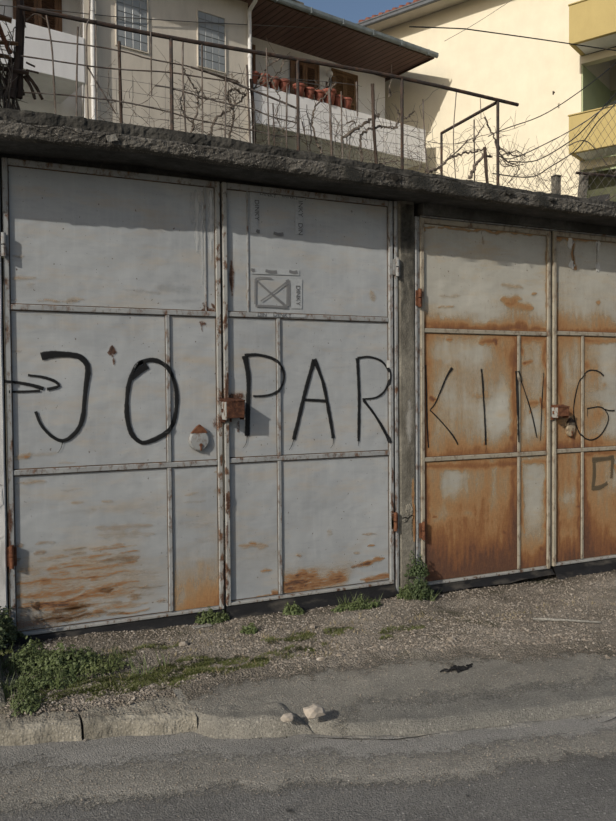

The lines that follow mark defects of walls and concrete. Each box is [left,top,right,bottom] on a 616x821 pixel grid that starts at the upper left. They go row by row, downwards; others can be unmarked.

corrosion [218,372,243,403]
corrosion [424,226,547,582]
corrosion [556,282,616,562]
corrosion [6,509,20,547]
corrosion [16,544,148,629]
corrosion [257,494,395,597]